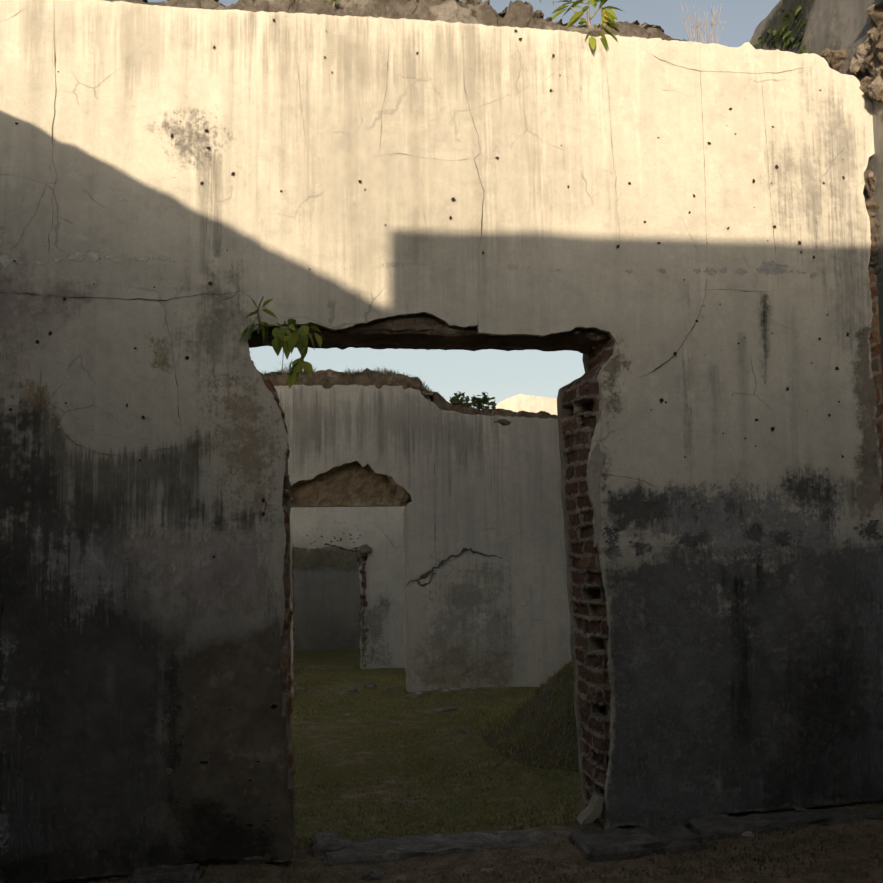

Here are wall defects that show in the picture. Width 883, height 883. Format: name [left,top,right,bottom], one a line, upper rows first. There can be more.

crack [0,290,252,456]
crack [379,34,484,242]
crack [635,53,808,379]
spalling [864,167,883,466]
leakage [0,401,294,883]
spalling [251,360,412,866]
crack [407,548,502,587]
spalling [557,338,653,830]
leakage [602,452,883,827]